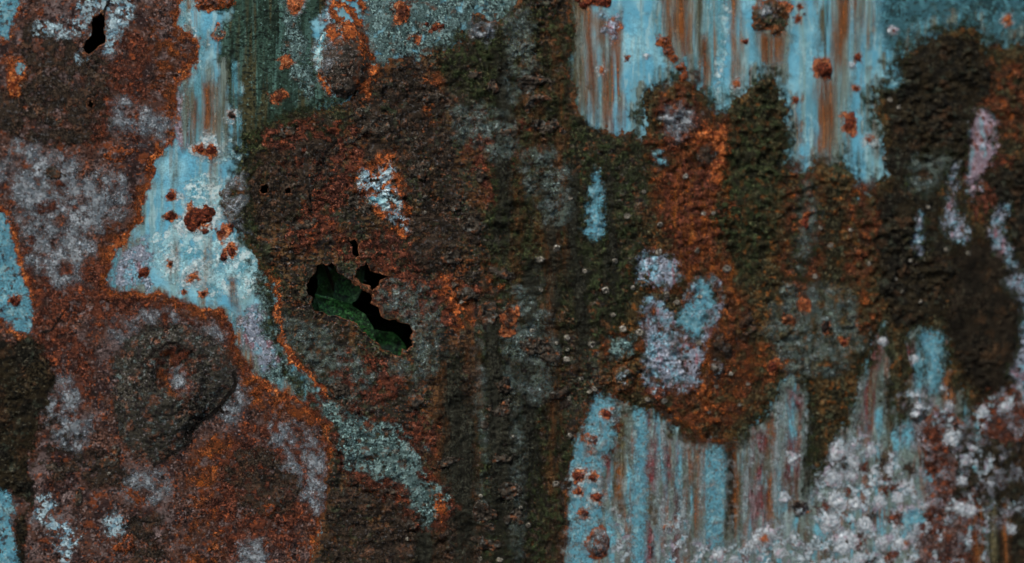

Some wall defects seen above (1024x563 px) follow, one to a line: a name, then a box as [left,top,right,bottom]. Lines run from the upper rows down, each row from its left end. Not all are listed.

corrosion [0,0,811,563]
corrosion [853,338,882,430]